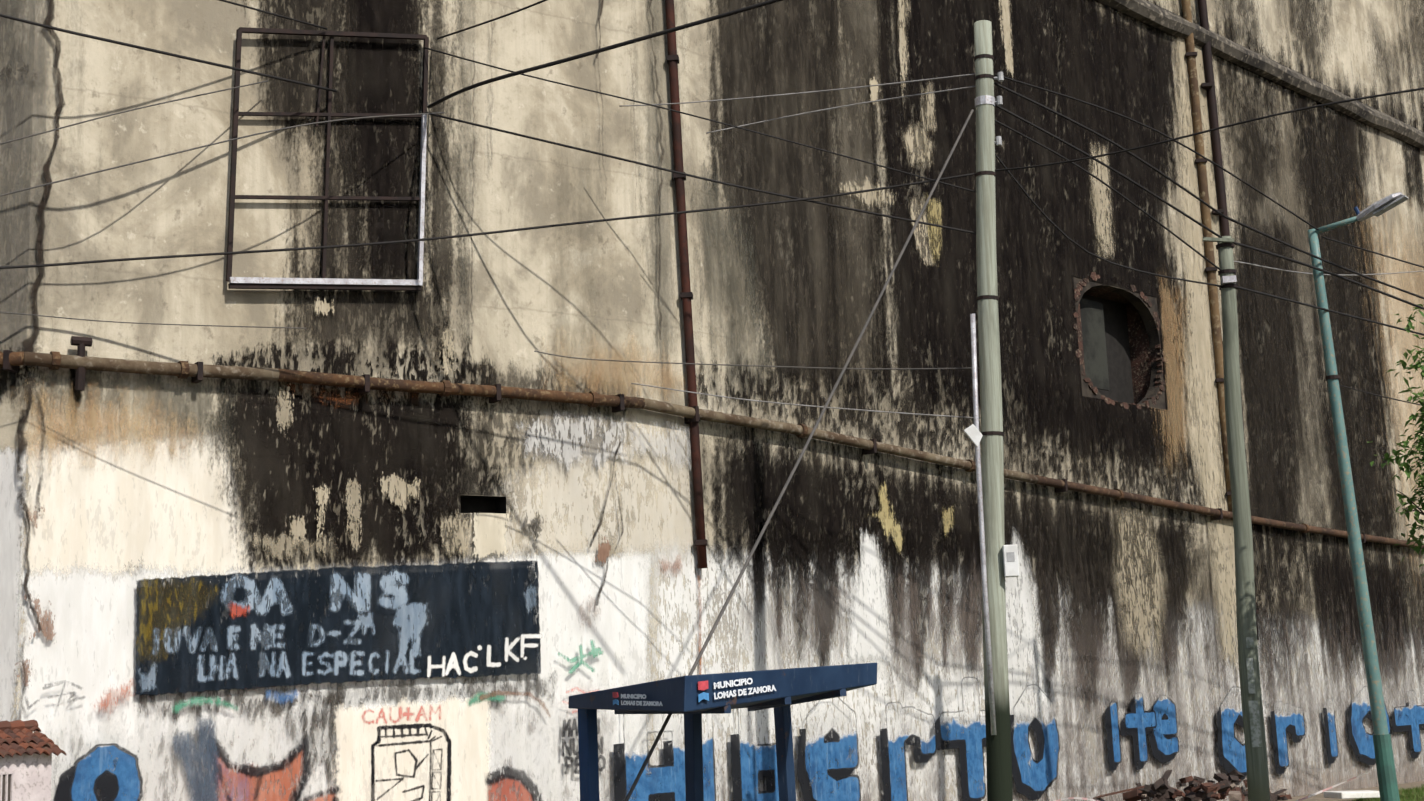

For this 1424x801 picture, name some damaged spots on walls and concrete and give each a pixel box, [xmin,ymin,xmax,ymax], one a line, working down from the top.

water stain [0,0,41,310]
crack [17,0,65,630]
water stain [0,351,124,420]
water stain [148,0,635,572]
water stain [696,0,1424,801]